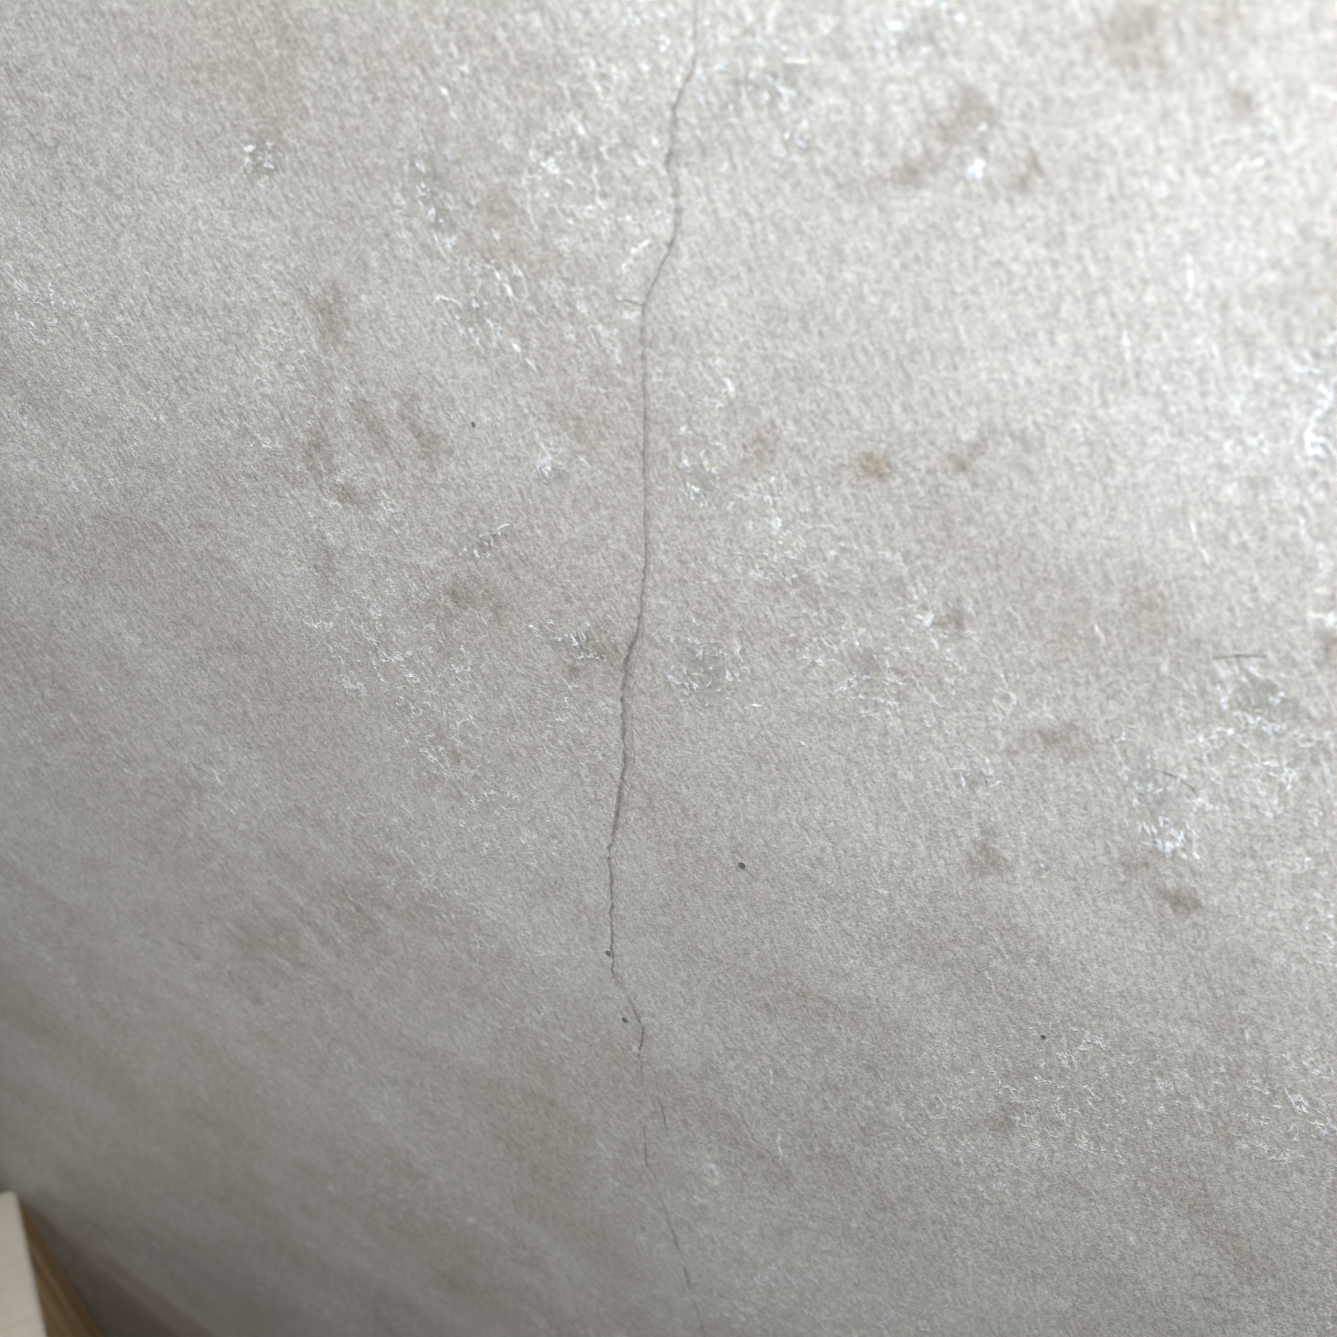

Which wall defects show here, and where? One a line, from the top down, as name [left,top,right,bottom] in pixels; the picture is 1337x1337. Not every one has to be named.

crack [606,0,699,1157]
crack [658,1193,707,1337]